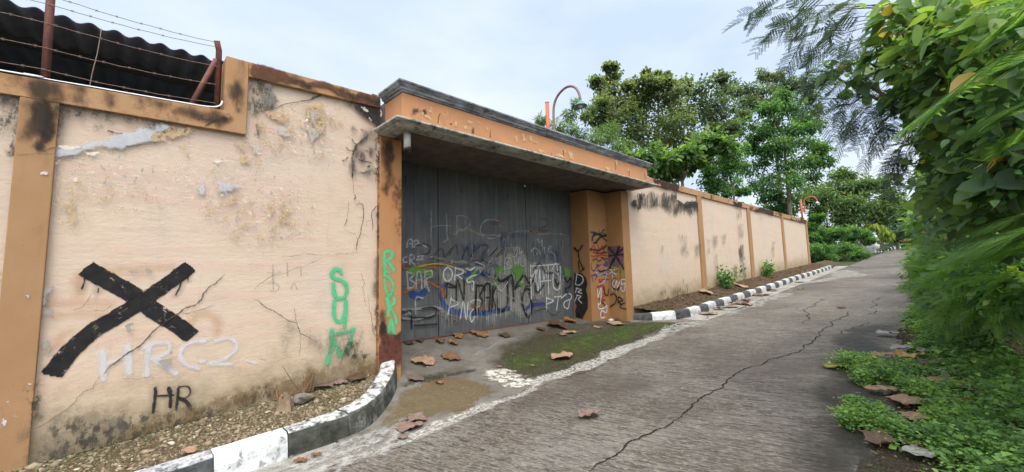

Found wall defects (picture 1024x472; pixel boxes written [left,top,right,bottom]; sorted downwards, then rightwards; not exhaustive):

leakage [0,78,138,156]
peeling [55,101,346,244]
crack [253,129,377,361]
leakage [632,191,698,214]
crack [39,274,225,427]
crack [589,296,883,471]